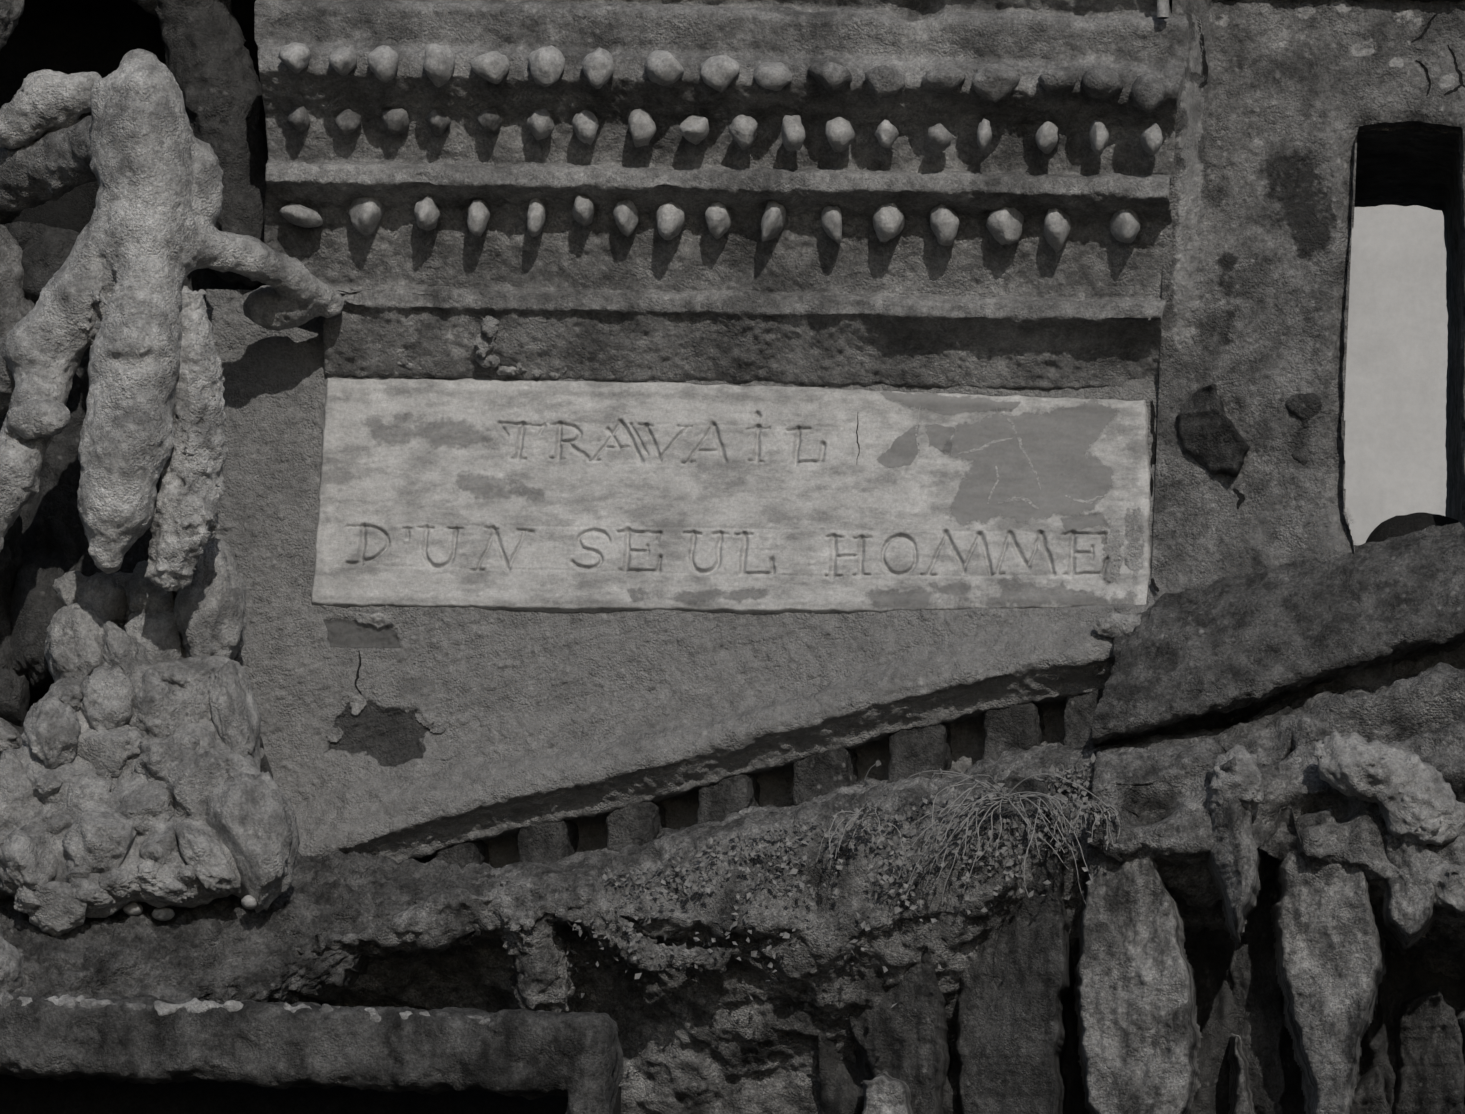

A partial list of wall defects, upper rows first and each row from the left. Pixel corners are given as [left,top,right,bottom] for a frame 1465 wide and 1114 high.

spalling [323,694,447,766]